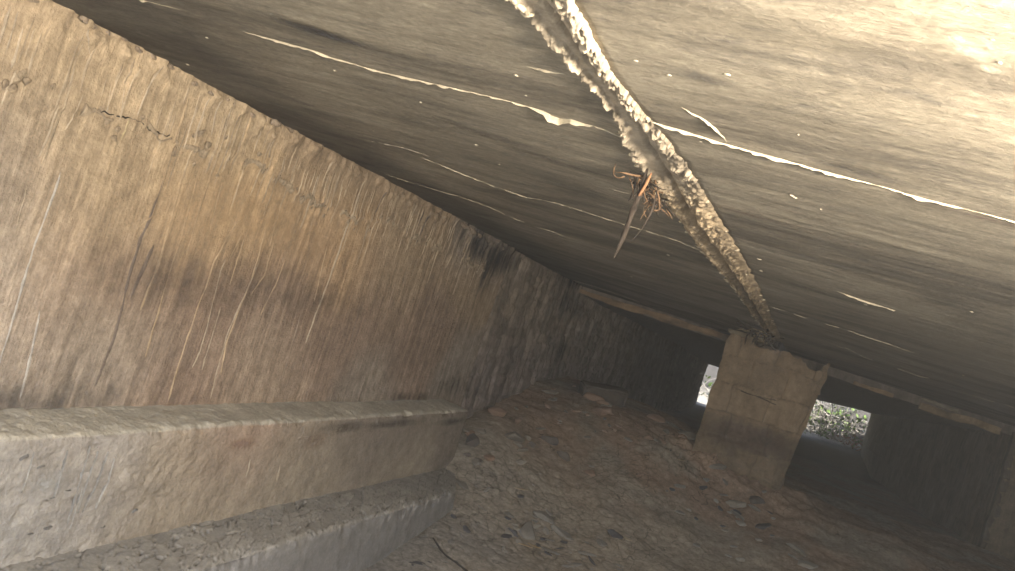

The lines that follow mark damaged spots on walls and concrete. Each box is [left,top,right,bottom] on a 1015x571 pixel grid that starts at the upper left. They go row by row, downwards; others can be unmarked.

leakage [0,7,52,108]
leakage [39,29,96,166]
crack [101,110,170,137]
leakage [303,27,354,44]
leakage [0,172,61,363]
leakage [95,86,513,400]
leakage [20,311,40,398]